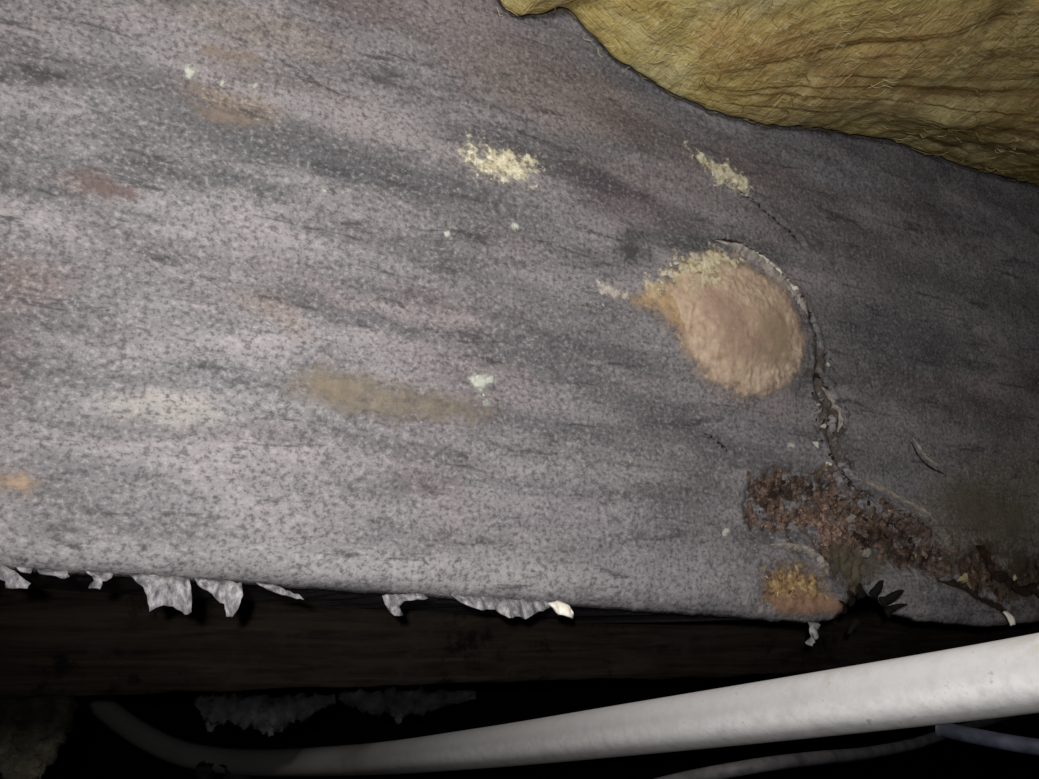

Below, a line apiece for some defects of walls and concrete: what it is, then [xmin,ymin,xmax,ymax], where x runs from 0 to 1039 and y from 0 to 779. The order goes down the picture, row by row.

spalling [597,238,812,402]
crack [807,322,939,537]
crack [911,437,944,474]
peeling [0,565,69,589]
peeling [85,571,114,590]
peeling [128,573,305,618]
peeling [382,592,428,616]
peeling [450,594,574,620]
corrosion [762,561,842,613]
corrosion [913,540,1039,627]